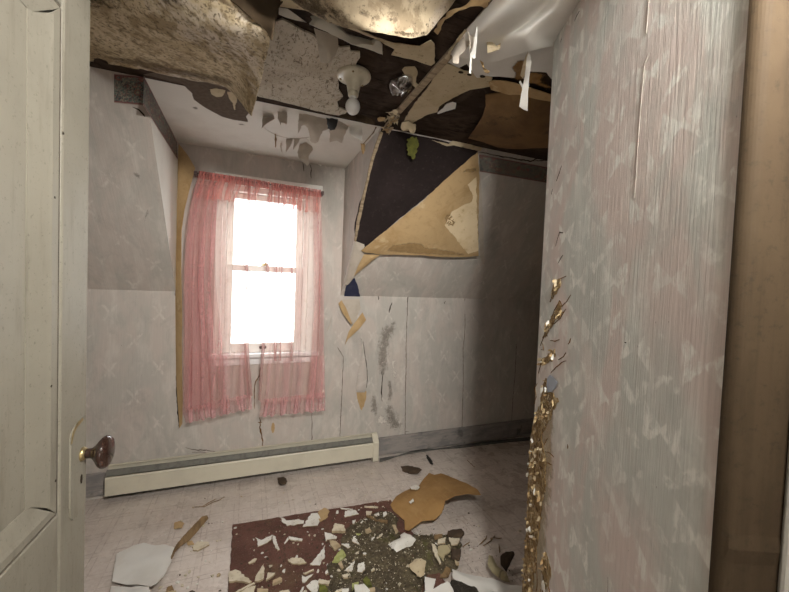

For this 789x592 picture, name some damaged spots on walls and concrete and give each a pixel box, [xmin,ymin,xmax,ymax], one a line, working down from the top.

peeling [144,72,248,125]
peeling [338,128,478,344]
crack [254,370,263,446]
peeling [356,391,367,411]
flaking render [521,276,571,592]